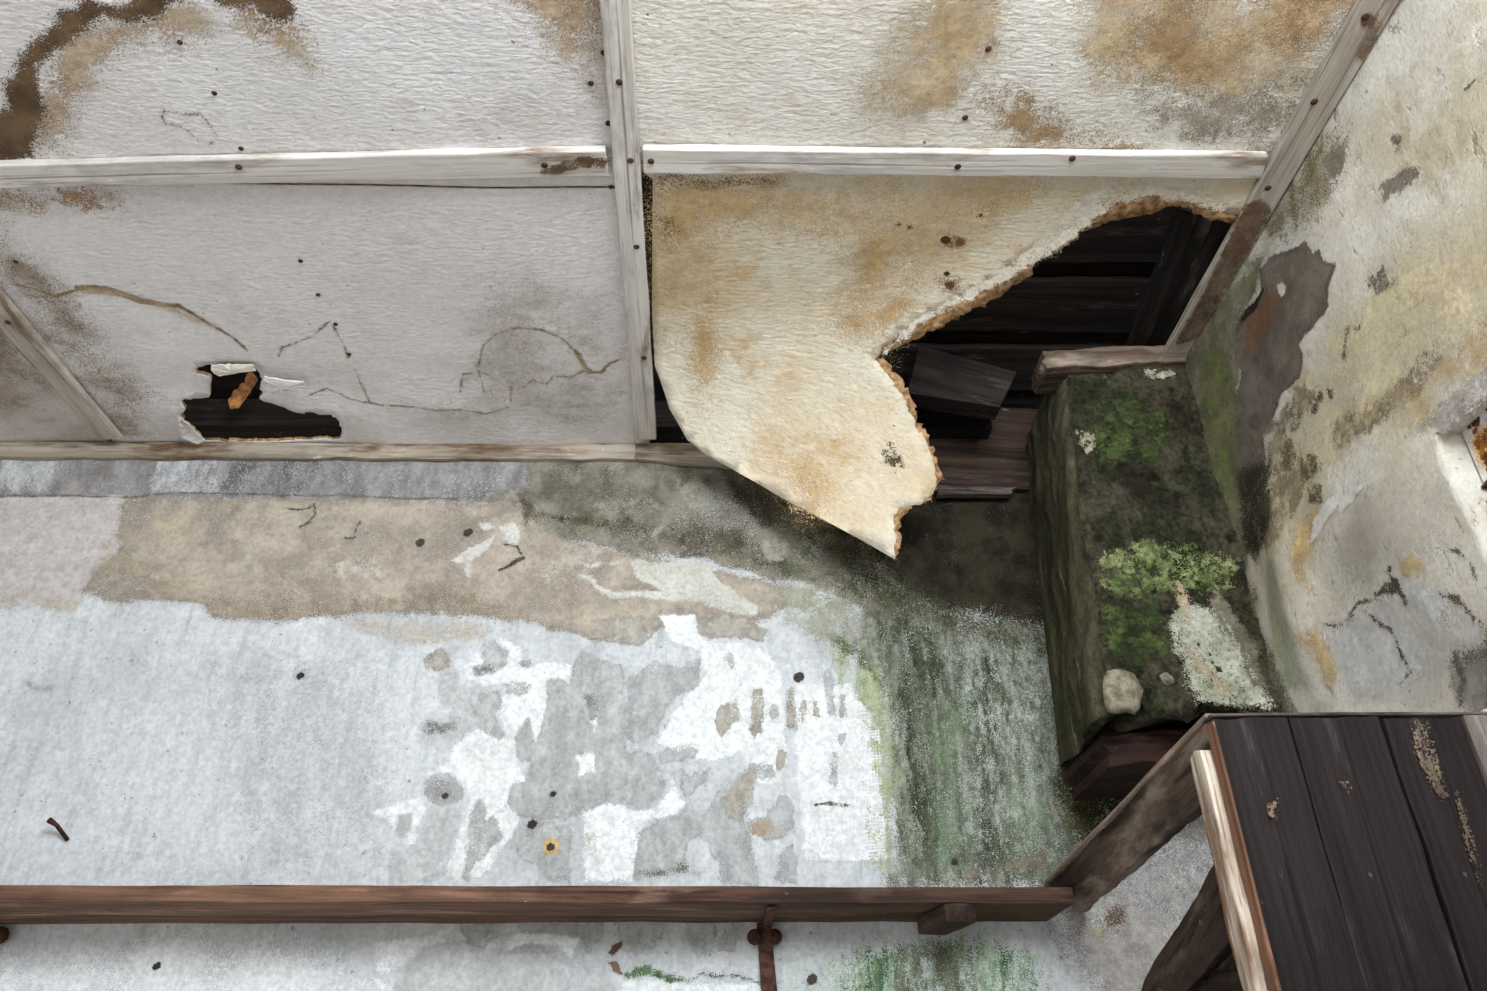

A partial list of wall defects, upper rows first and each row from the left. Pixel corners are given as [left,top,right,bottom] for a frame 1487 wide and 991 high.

water stain [0,0,339,160]
water stain [475,0,609,125]
water stain [833,0,1356,153]
peeling [1175,199,1271,345]
peeling [178,416,205,444]
peeling [211,363,305,396]
flaking render [1223,240,1487,712]
peeling [386,613,798,886]
peeling [714,670,847,787]
water stain [1442,623,1487,712]